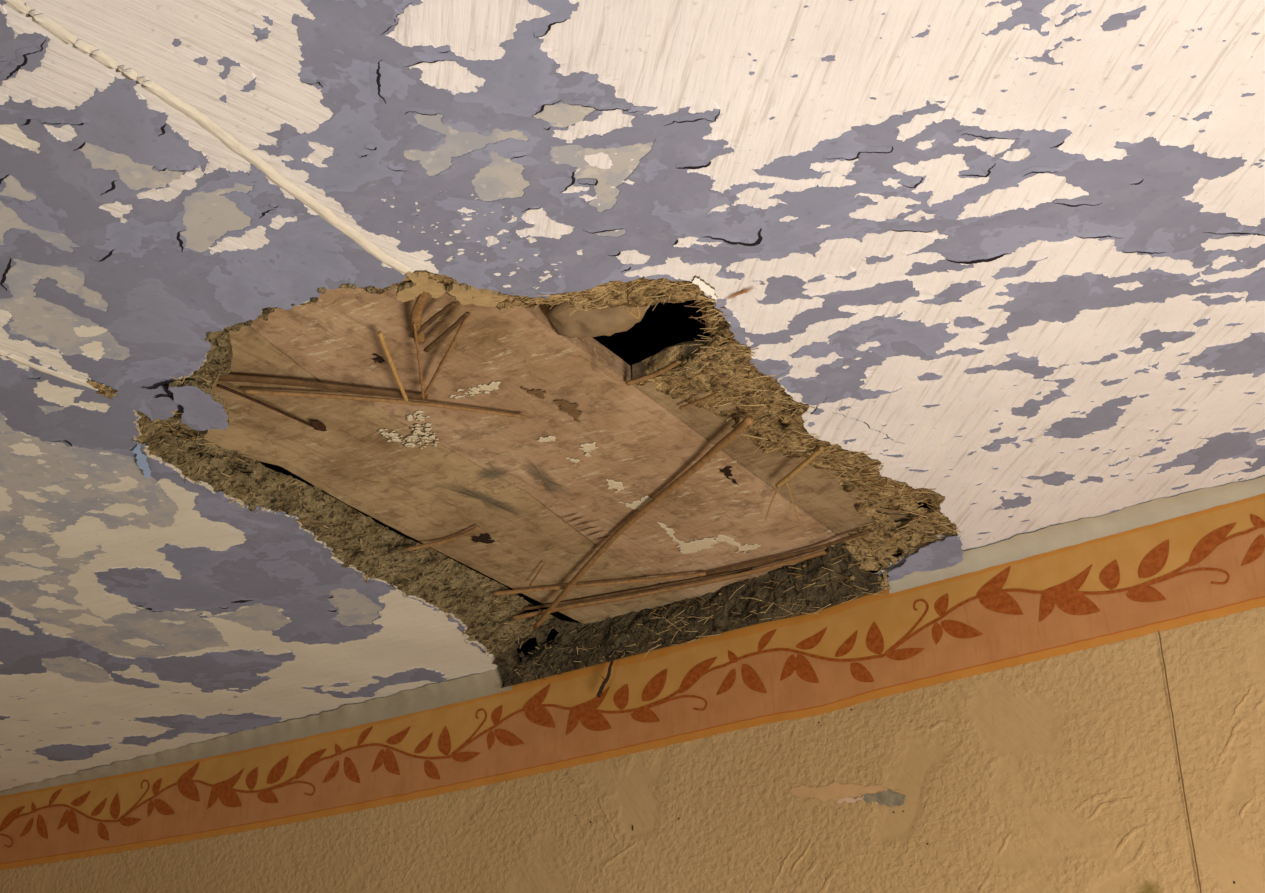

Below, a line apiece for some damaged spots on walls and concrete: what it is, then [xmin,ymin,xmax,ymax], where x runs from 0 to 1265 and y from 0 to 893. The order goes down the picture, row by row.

peeling [0,0,575,307]
peeling [377,0,1265,555]
peeling [874,549,919,575]
flaking render [863,790,906,807]